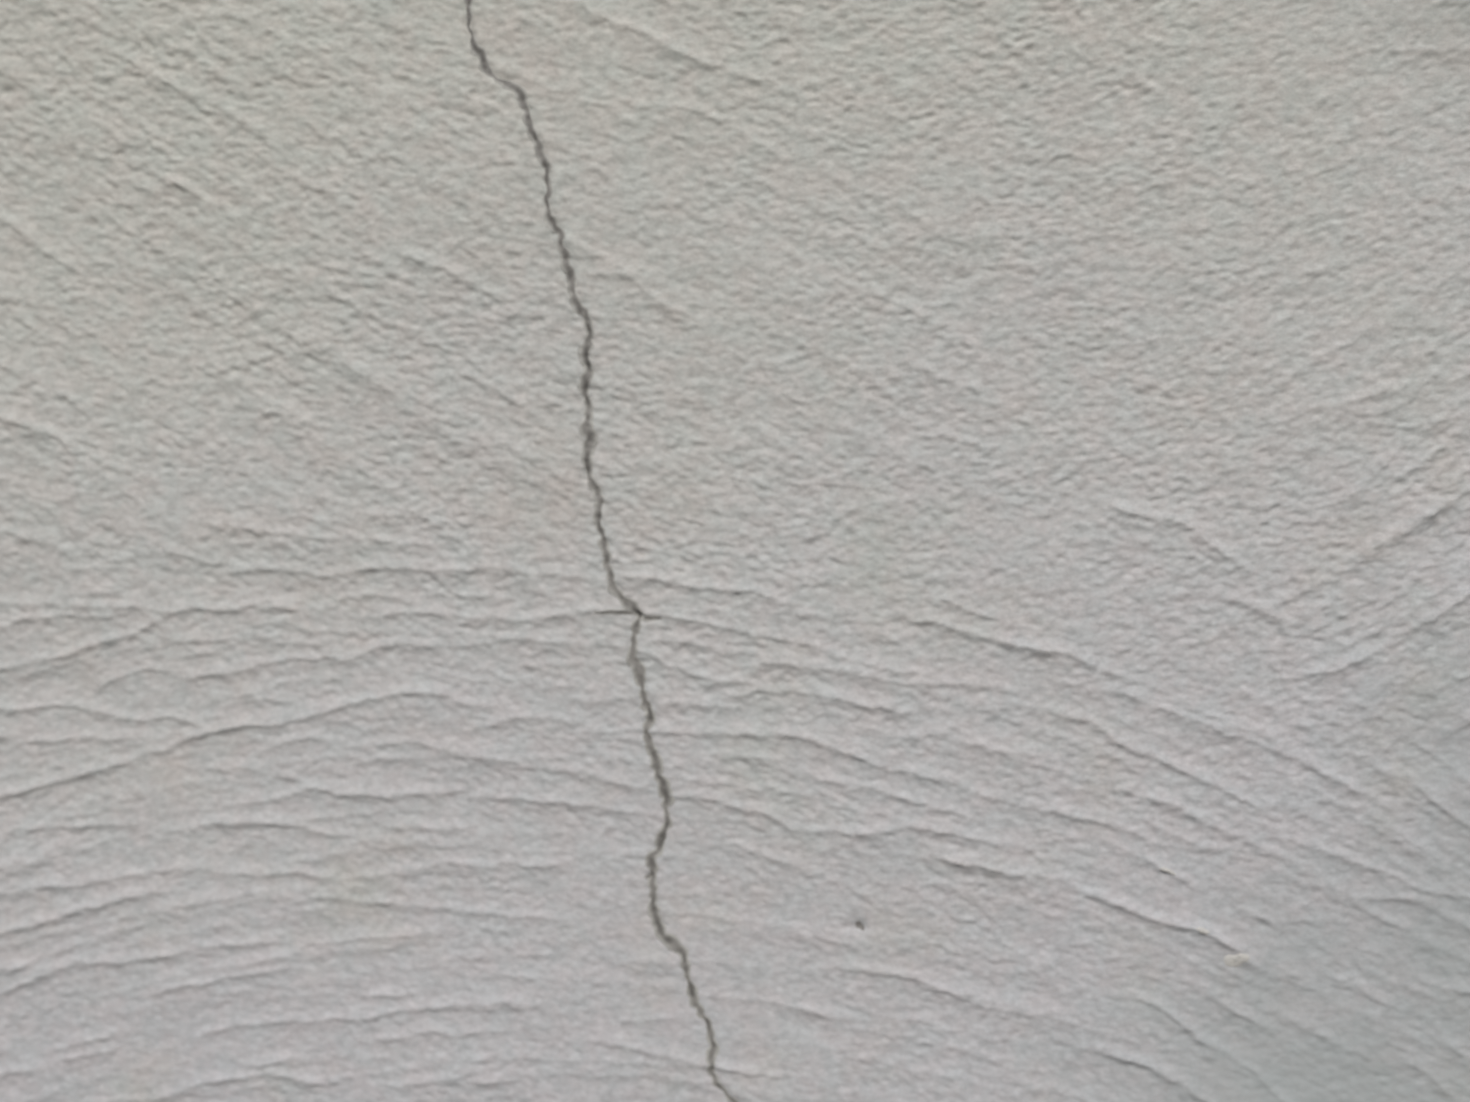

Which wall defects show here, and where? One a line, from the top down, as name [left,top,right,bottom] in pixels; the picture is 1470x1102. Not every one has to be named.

crack [464,0,739,1102]